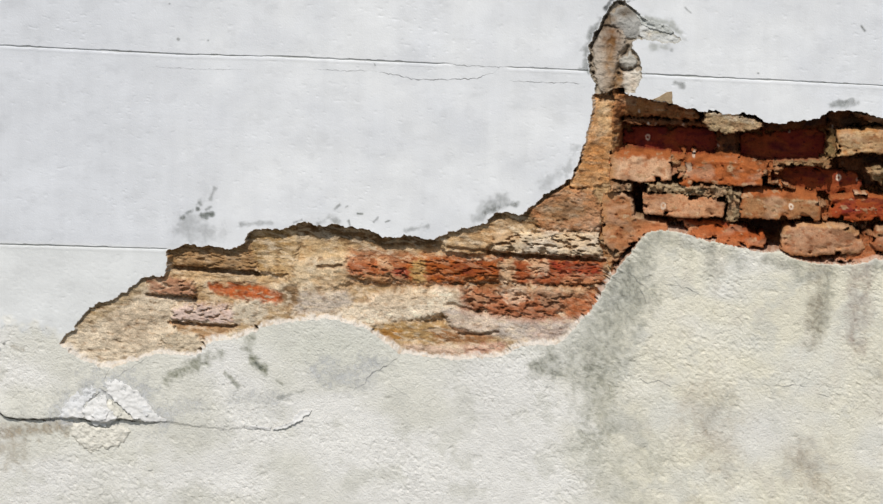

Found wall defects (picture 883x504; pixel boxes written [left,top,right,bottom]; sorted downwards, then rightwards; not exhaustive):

flaking render [60,0,883,369]
crack [0,376,137,422]